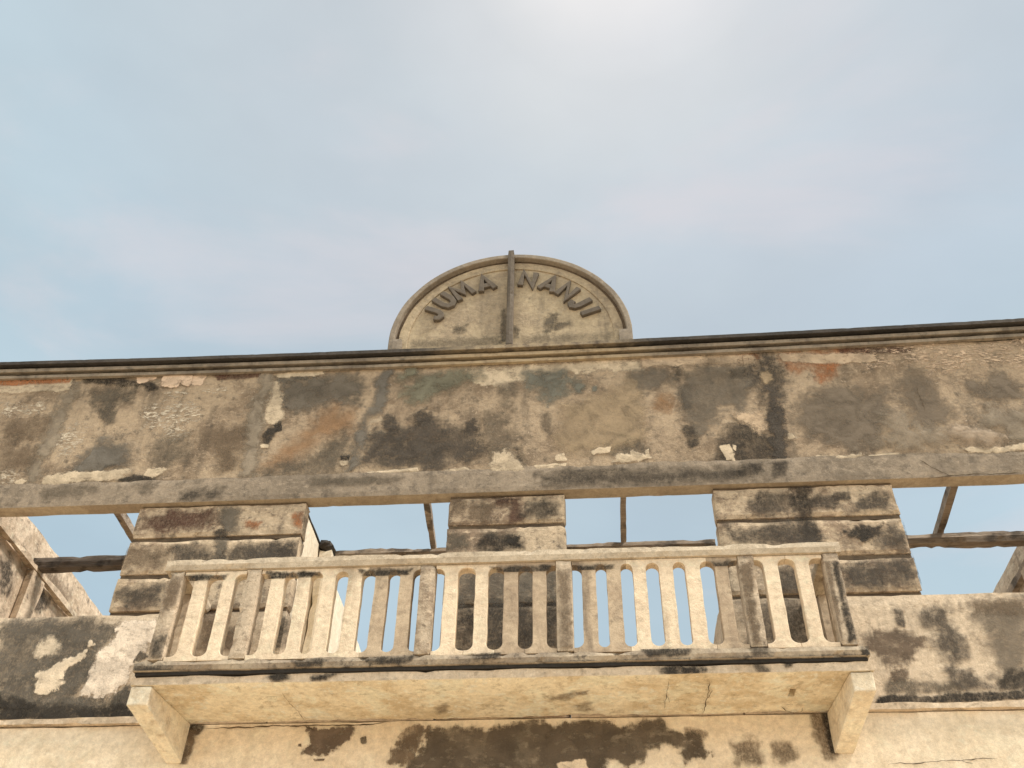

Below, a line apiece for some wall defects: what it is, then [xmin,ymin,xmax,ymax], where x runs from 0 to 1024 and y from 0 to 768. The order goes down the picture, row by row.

corrosion [785,347,910,383]
flaking render [136,375,227,442]
water stain [263,368,523,485]
flaking render [591,447,652,463]
flaking render [719,444,736,461]
water stain [631,346,956,479]
water stain [723,486,889,543]
water stain [0,560,13,595]
water stain [0,573,133,720]
flaking render [34,619,156,698]
water stain [876,600,1024,703]
water stain [732,742,762,764]